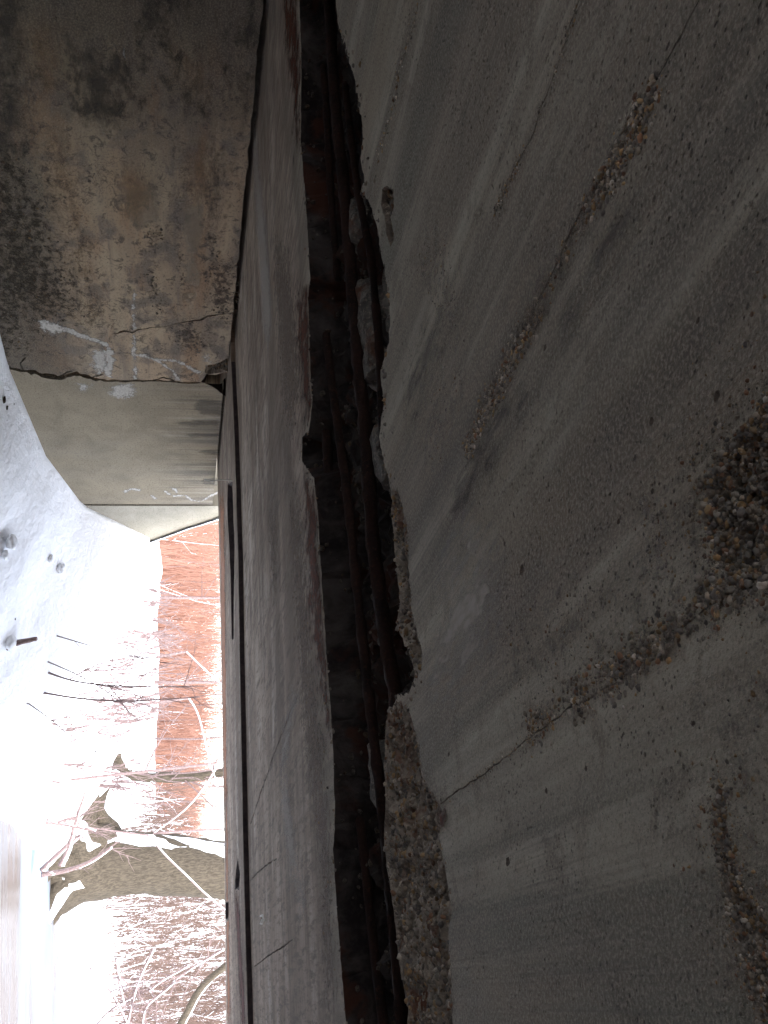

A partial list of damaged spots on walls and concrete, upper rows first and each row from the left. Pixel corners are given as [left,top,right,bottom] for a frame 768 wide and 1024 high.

water stain [67,37,146,124]
crack [9,356,197,384]
crack [113,308,238,334]
corrosion [304,477,330,730]
spalling [298,0,456,1024]
crack [441,559,768,804]